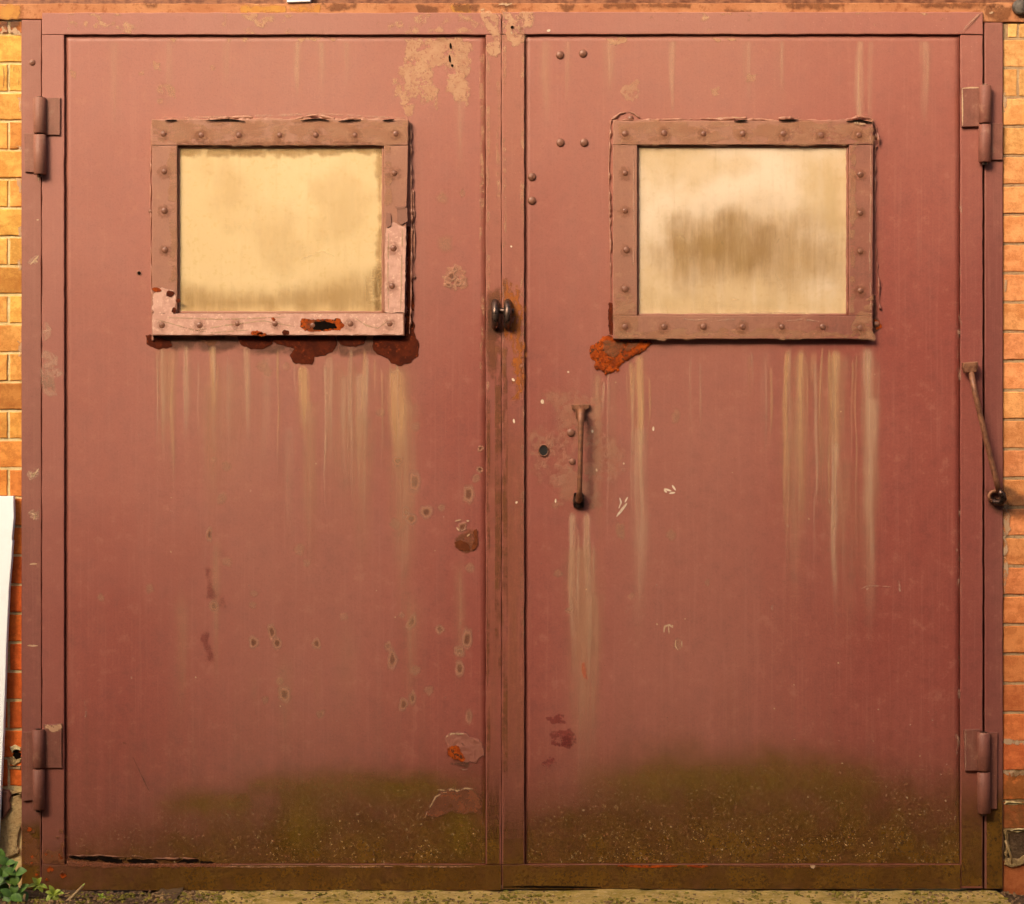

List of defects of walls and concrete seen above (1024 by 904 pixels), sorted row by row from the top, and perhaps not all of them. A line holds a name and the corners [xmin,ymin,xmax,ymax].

peeling [137,3,533,341]
corrosion [152,287,181,314]
corrosion [237,226,419,366]
corrosion [146,335,172,350]
corrosion [198,336,224,345]
corrosion [589,302,652,376]
corrosion [486,280,525,606]
corrosion [455,530,474,552]
peeling [445,732,484,763]
peeling [425,788,482,817]